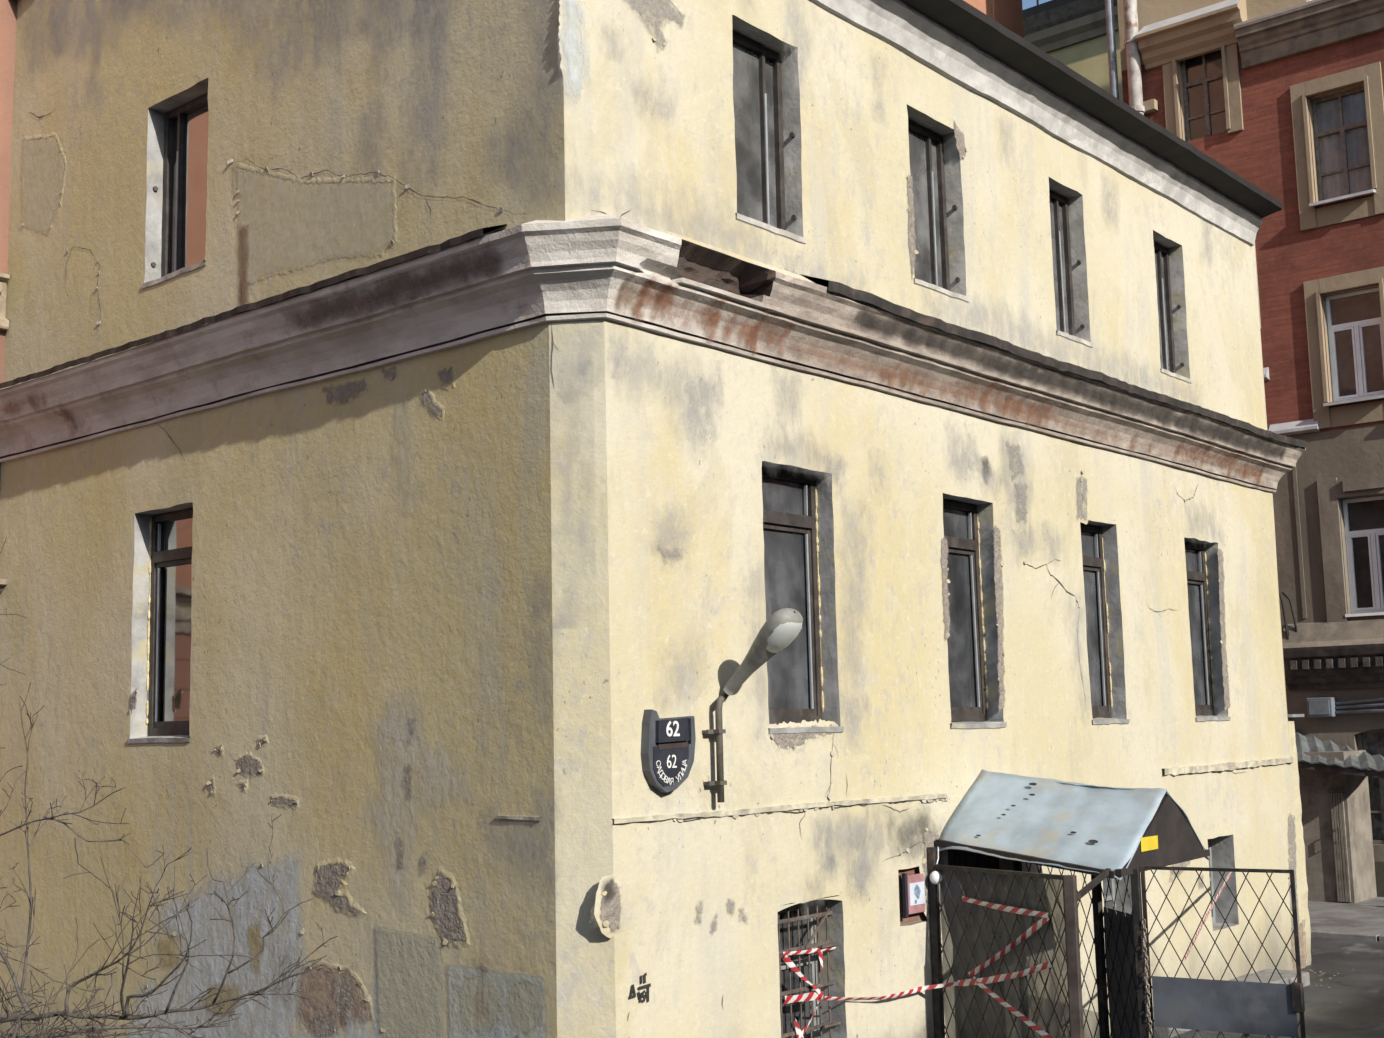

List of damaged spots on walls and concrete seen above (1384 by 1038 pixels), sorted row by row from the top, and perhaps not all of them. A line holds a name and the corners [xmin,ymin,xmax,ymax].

peeling [619,0,685,53]
crack [227,155,526,214]
crack [65,247,101,330]
rust [618,282,720,324]
rust [739,322,776,345]
crack [1024,559,1087,708]
peeling [213,735,269,794]
peeling [270,792,299,811]
spalling [312,857,367,919]
spalling [428,865,471,951]
spalling [594,875,624,939]
peeling [295,959,385,1038]